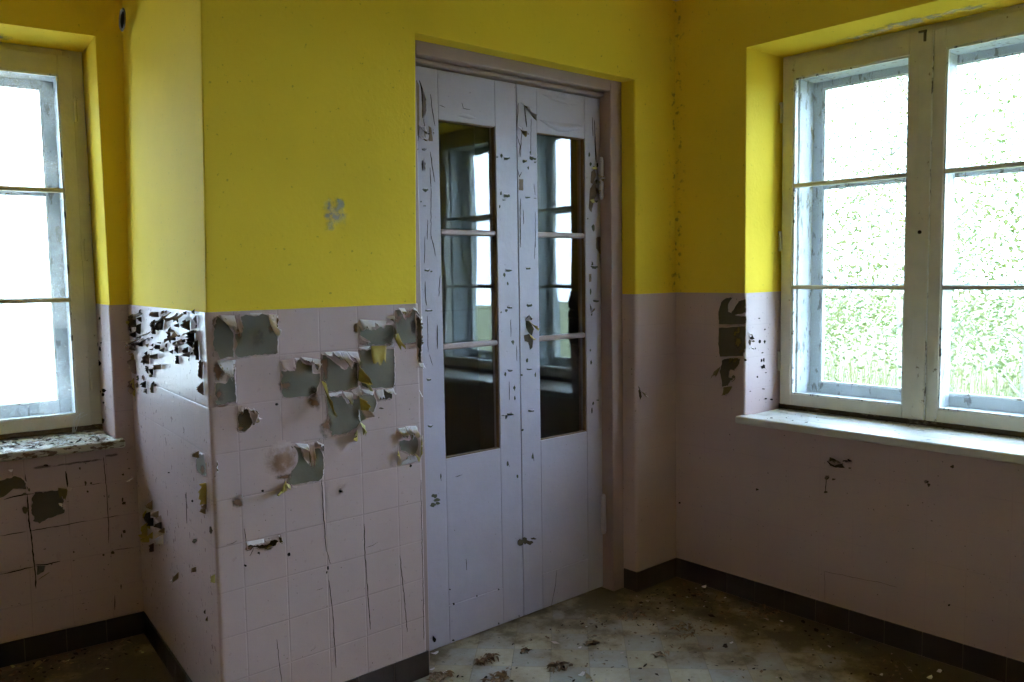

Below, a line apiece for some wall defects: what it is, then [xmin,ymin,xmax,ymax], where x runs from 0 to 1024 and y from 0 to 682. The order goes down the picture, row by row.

peeling [710,297,773,400]
peeling [124,307,433,496]
peeling [0,469,72,524]
crack [3,458,134,587]
peeling [121,500,165,552]
peeling [191,451,207,514]
peeling [244,529,290,567]
crack [311,483,336,660]
crack [364,526,376,629]
crack [400,501,424,627]
peeling [824,457,852,493]